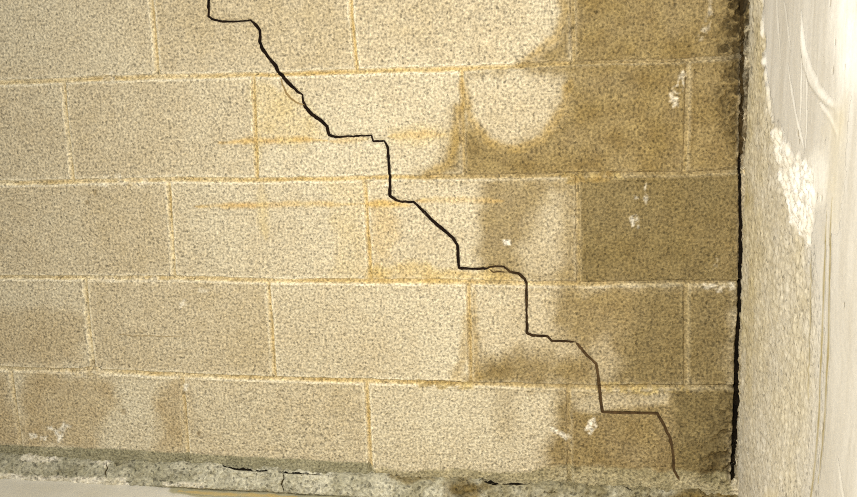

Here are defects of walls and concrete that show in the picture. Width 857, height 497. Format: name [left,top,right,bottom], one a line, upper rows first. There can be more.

crack [207,0,680,481]
water stain [400,0,751,487]
crack [730,0,745,480]
water stain [167,487,349,497]